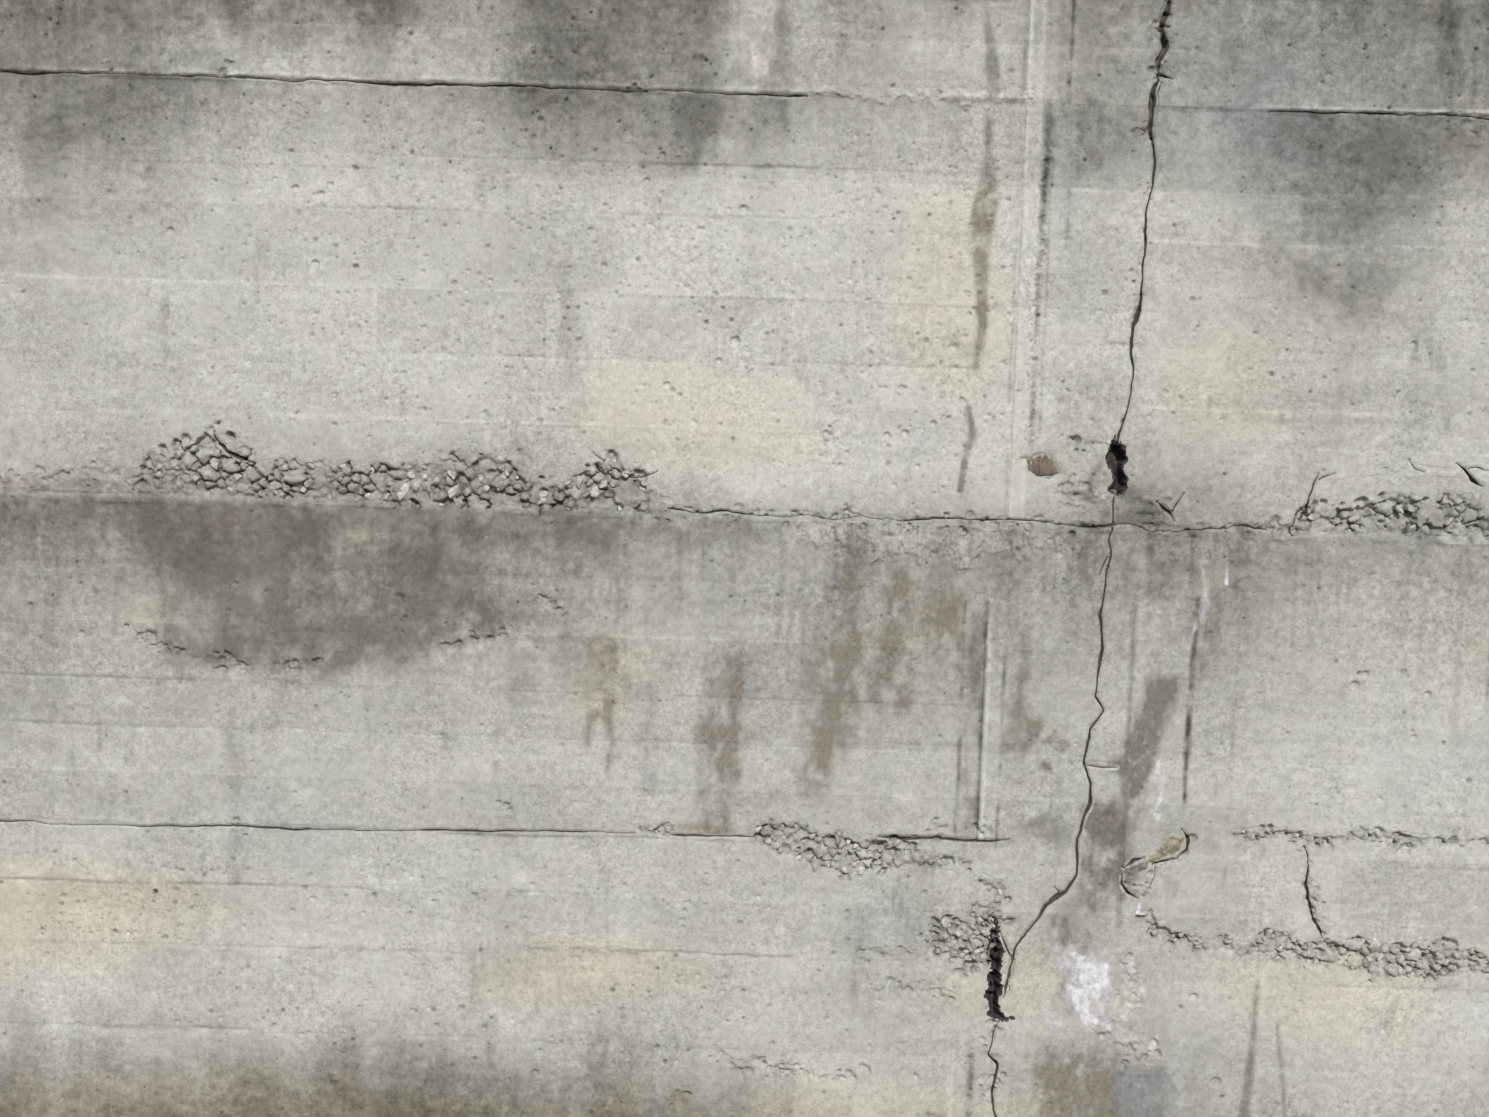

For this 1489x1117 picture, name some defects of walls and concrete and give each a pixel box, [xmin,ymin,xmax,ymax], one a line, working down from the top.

peeling [207,59,252,88]
leakage [747,0,777,80]
crack [1112,0,1174,445]
spalling [0,81,1489,581]
leakage [187,525,443,673]
leakage [701,664,742,779]
leakage [815,573,861,770]
crack [591,451,1335,1117]
spalling [752,817,1017,1007]
leakage [1042,945,1162,1117]
leakage [1242,1024,1256,1115]
spalling [1091,824,1489,1070]